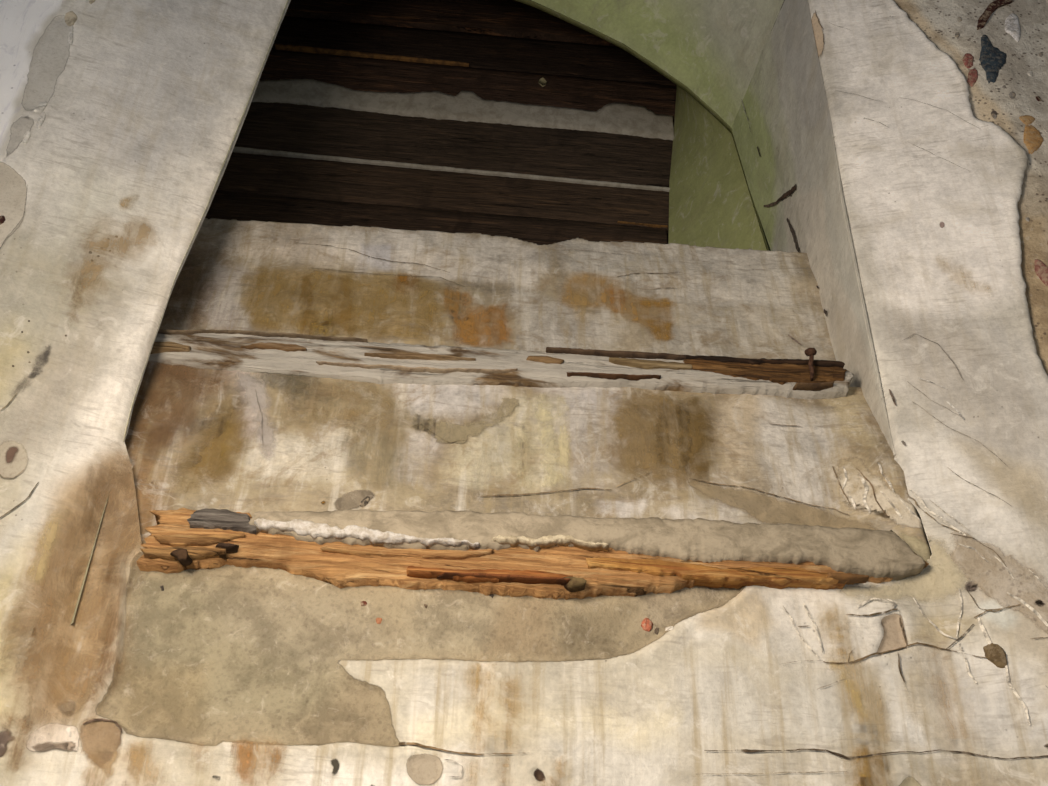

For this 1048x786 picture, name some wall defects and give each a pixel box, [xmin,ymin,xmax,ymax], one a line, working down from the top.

flaking render [0,11,77,248]
spalling [893,0,1048,374]
leakage [613,394,710,476]
spalling [321,490,374,510]
crack [688,478,932,562]
leakage [17,460,140,705]
flaking render [833,457,1048,683]
spalling [26,553,745,777]
crack [782,604,1020,689]
flaking render [406,754,463,785]
spalling [534,769,545,783]
crack [704,744,1048,775]